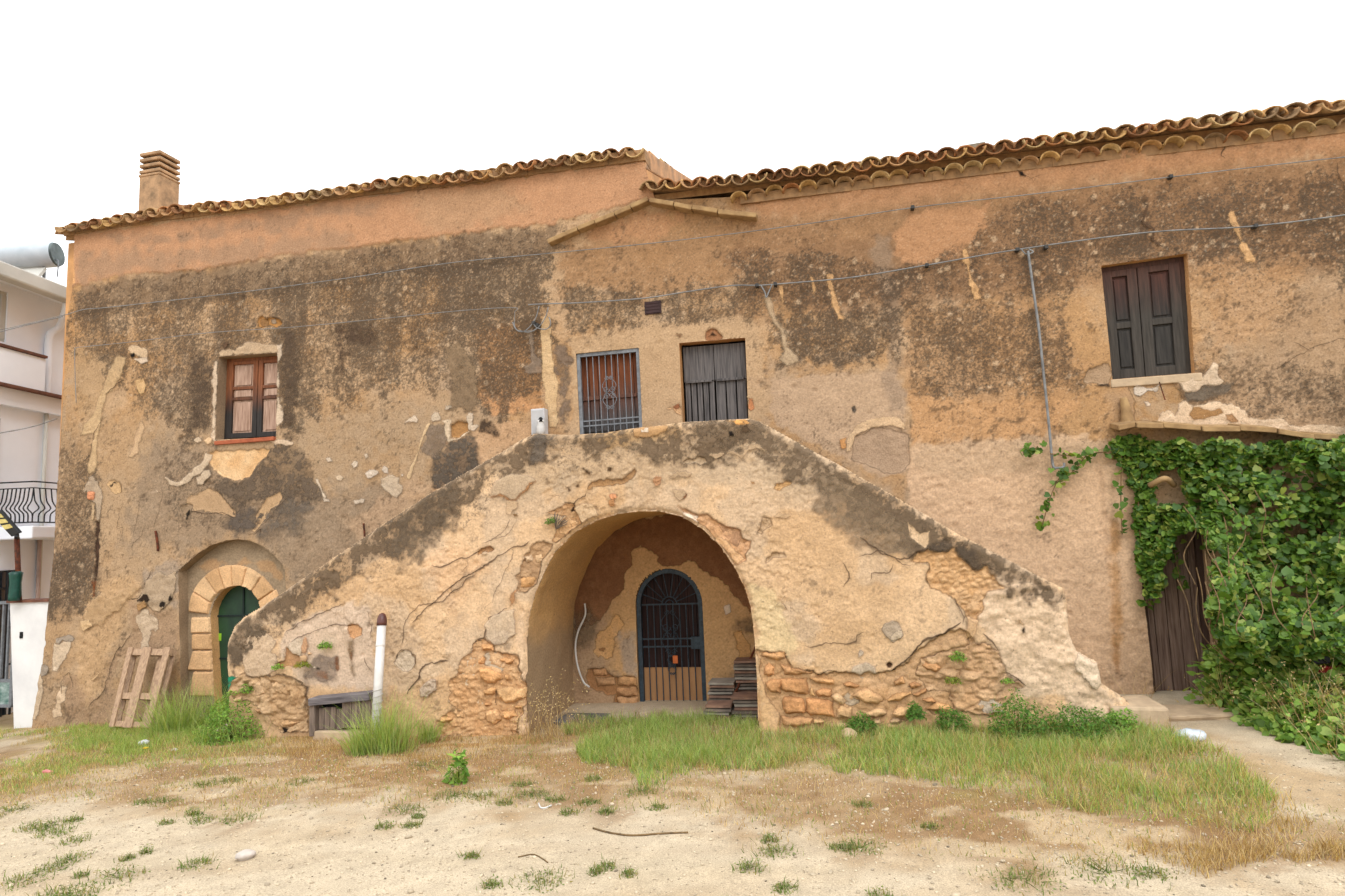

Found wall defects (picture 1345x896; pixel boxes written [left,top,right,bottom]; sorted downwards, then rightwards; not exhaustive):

leakage [1229,211,1255,262]
leakage [811,274,844,319]
leakage [962,249,981,299]
flaking render [157,316,293,520]
flaking render [336,406,478,481]
flaking render [1084,363,1112,387]
flaking render [1129,363,1345,435]
flaking render [451,546,494,592]
flaking render [756,522,1023,732]
flaking render [228,633,311,733]
flaking render [419,639,527,737]
flaking render [1075,653,1101,690]